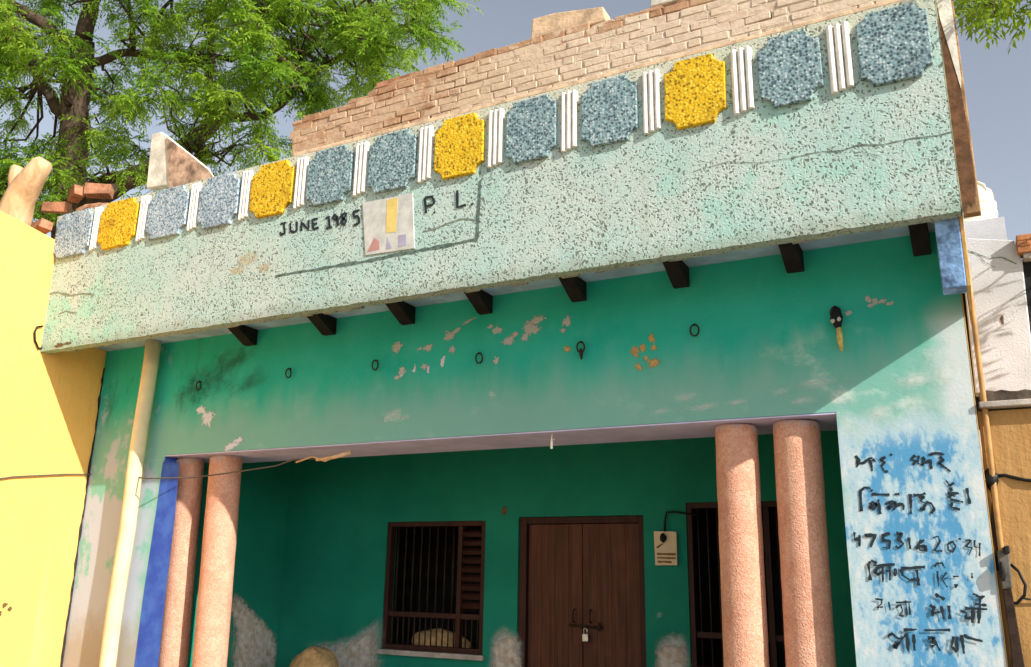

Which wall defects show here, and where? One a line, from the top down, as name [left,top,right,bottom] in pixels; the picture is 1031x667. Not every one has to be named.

crack [693,131,955,172]
peeling [865,295,894,308]
peeling [394,317,477,380]
peeling [487,316,546,345]
peeling [631,333,661,371]
peeling [196,405,215,428]
damp [231,598,277,667]
damp [321,627,378,667]
damp [493,633,520,667]